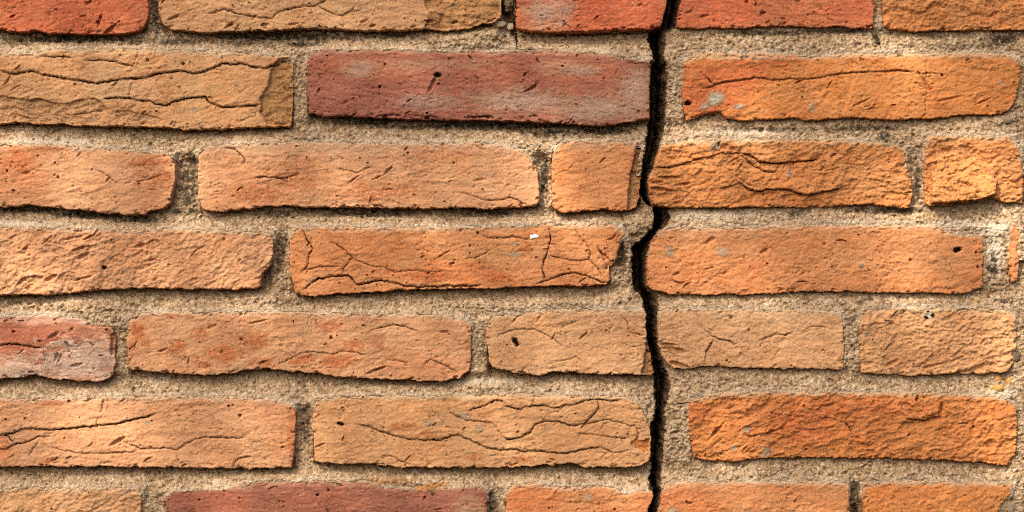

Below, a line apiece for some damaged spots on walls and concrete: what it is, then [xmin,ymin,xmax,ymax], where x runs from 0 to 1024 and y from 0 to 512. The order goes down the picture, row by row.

crack [359,0,840,512]